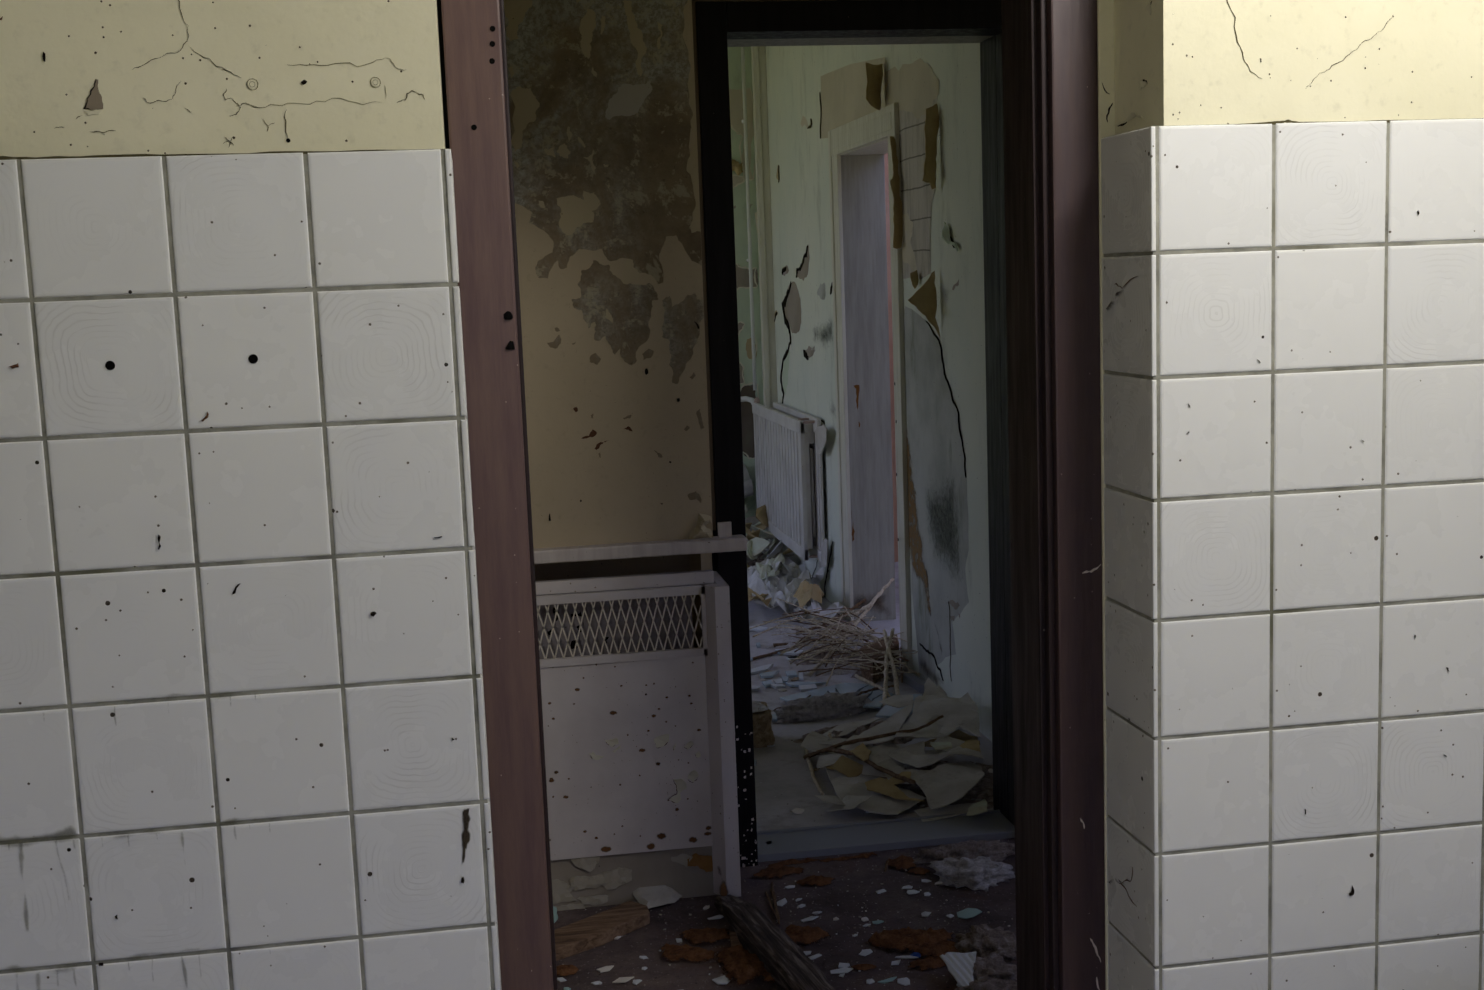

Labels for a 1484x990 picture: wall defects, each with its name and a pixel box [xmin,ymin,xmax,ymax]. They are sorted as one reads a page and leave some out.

crack [0,0,444,160]
crack [1226,0,1262,79]
crack [1234,17,1398,125]
peeling [504,0,704,384]
peeling [801,57,958,279]
peeling [775,245,832,404]